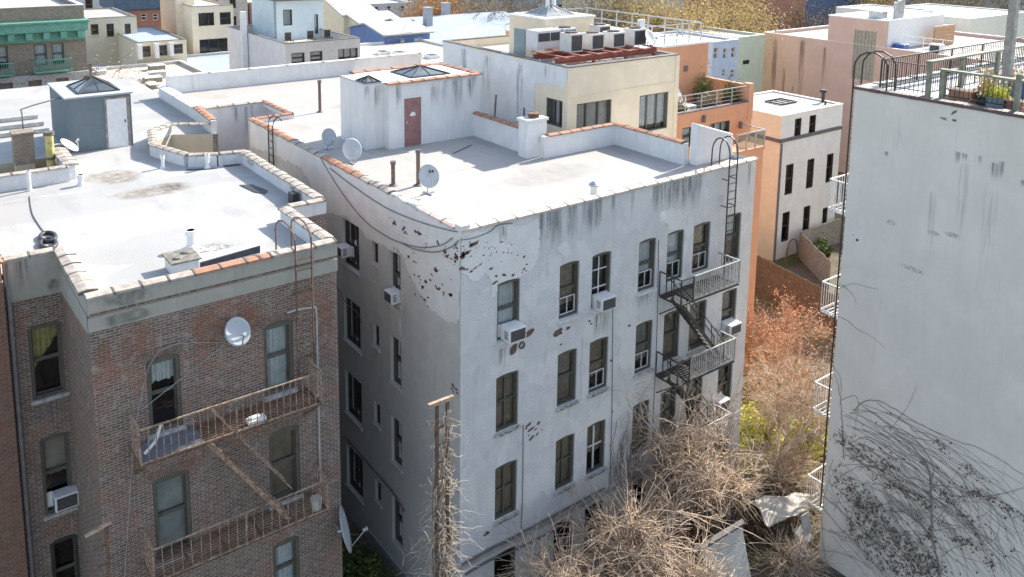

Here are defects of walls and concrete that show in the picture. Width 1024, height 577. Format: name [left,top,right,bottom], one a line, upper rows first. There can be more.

peeling [250,122,540,324]